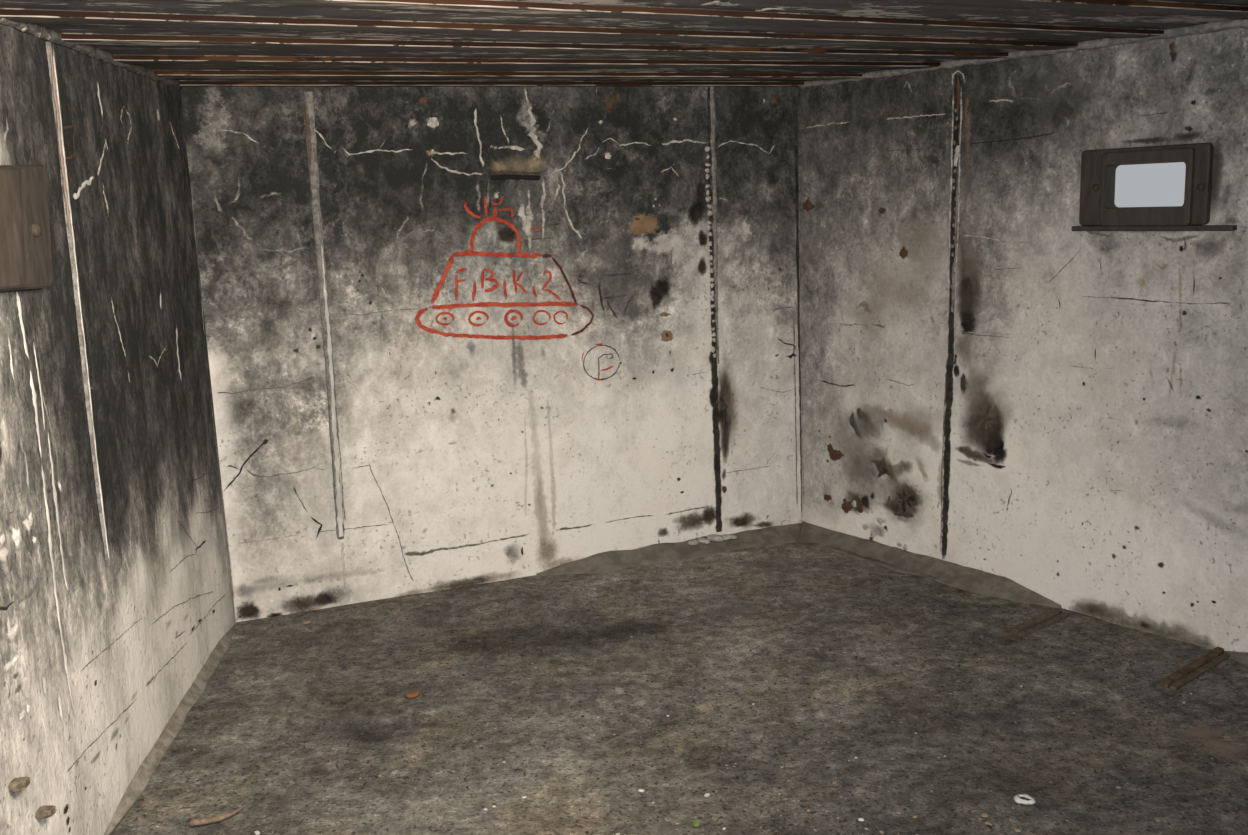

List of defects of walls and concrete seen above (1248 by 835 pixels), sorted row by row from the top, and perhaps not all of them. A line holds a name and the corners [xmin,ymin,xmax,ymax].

water stain [718,378,733,493]
water stain [958,396,1006,469]
peeling [0,509,39,573]
water stain [0,293,82,716]
crack [171,439,413,580]
water stain [703,507,716,524]
water stain [876,453,925,514]
peeling [4,616,21,672]
water stain [1074,605,1209,647]